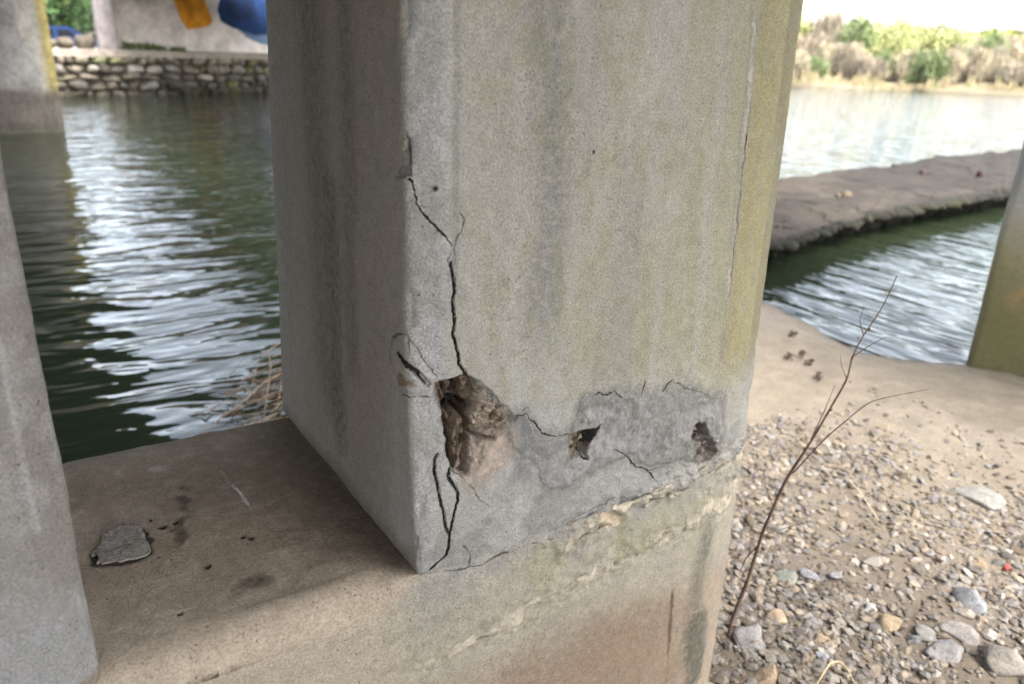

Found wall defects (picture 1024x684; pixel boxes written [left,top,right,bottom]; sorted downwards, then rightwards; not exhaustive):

crack [408,178,466,374]
spalling [389,332,517,485]
crack [420,454,616,576]
crack [513,380,715,437]
crack [614,449,671,481]
peeling [560,421,746,601]
peeling [406,593,547,674]